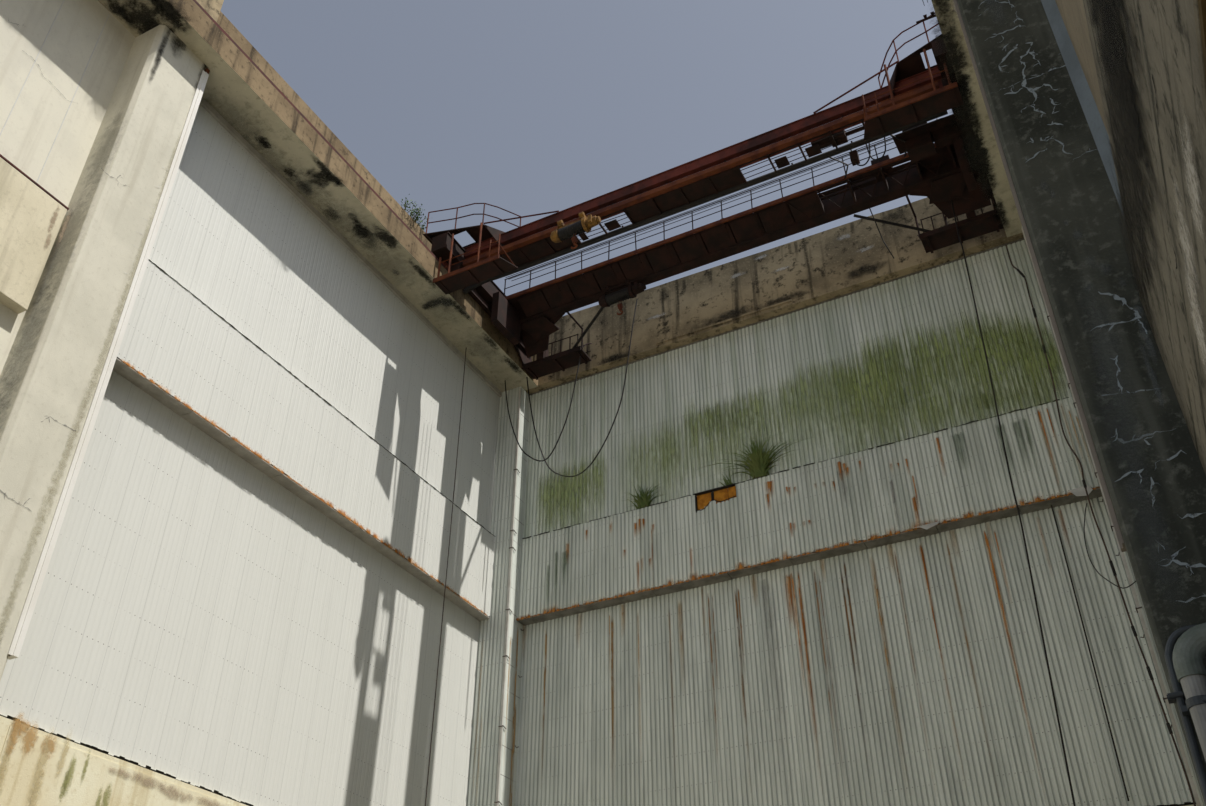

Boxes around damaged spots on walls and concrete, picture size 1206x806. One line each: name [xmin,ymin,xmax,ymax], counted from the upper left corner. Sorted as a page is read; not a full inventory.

damp [108,0,188,73]
crack [979,0,1096,162]
damp [284,160,343,194]
damp [325,210,397,248]
damp [413,265,470,318]
damp [706,307,747,327]
damp [767,292,805,306]
damp [848,263,883,277]
damp [777,317,1062,429]
corrosion [123,361,487,616]
corrosion [506,459,1073,806]